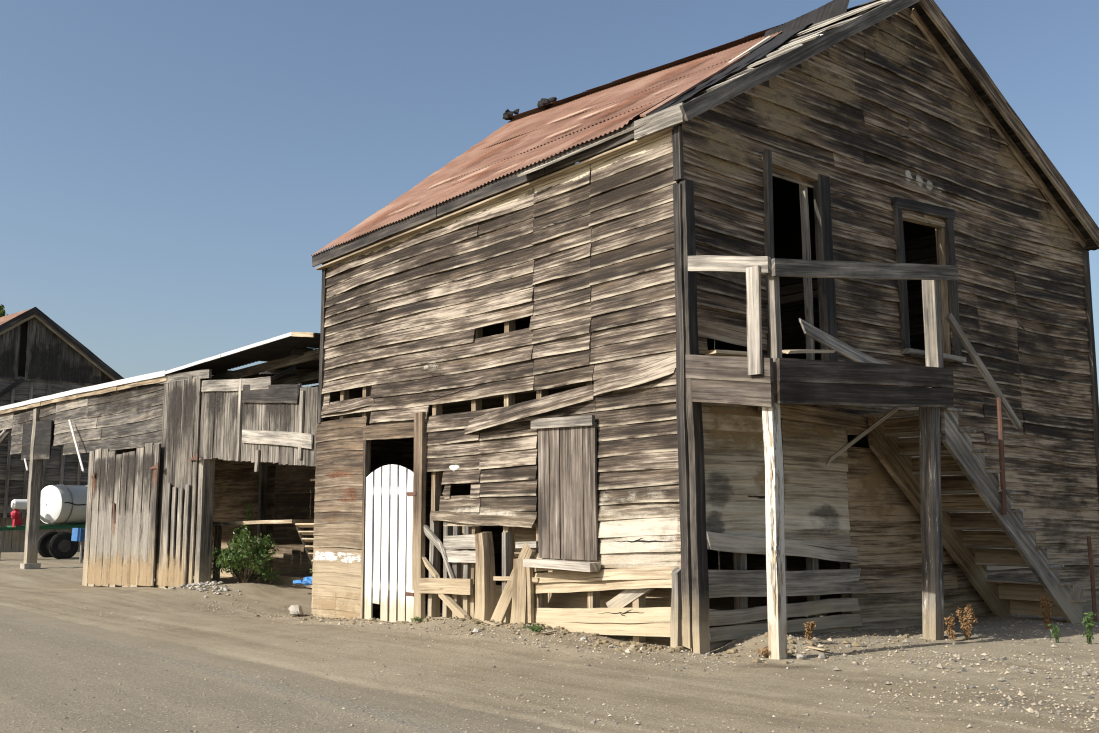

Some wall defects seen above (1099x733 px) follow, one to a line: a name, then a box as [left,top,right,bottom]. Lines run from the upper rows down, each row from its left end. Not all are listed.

peeling [314,551,361,563]